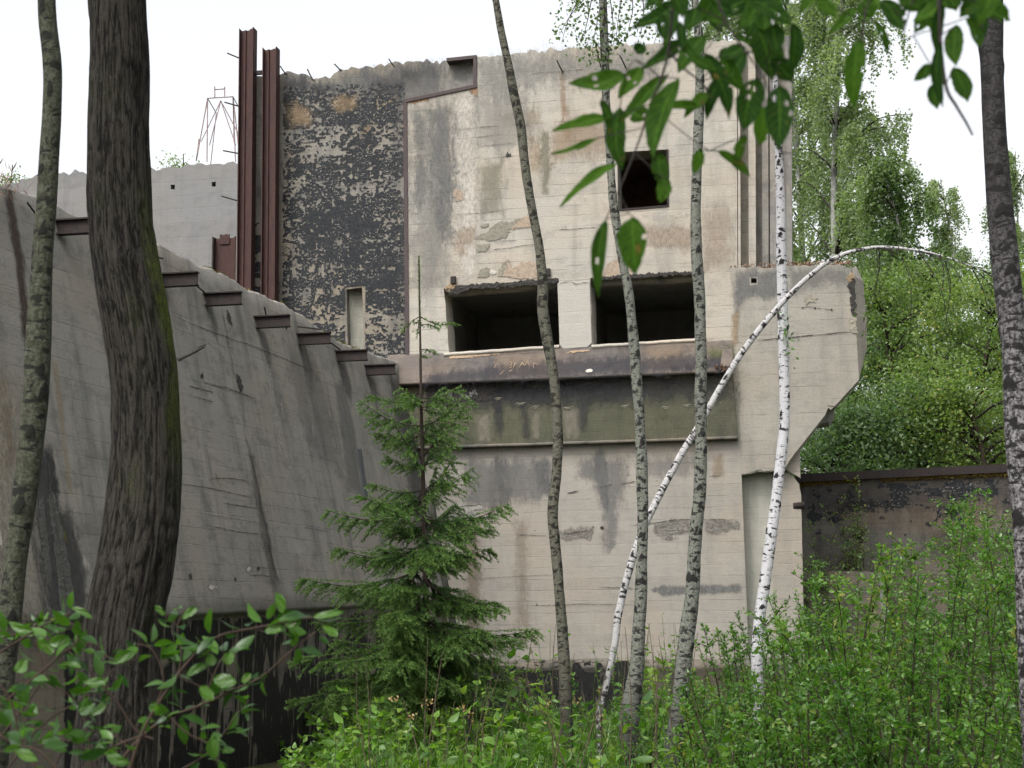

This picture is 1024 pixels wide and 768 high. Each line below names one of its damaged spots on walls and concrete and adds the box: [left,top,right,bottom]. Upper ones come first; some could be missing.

peeling [280,66,405,358]
water stain [434,94,478,281]
flaking render [457,214,531,254]
spalling [846,272,858,333]
water stain [33,447,89,618]
peeling [807,479,1010,544]